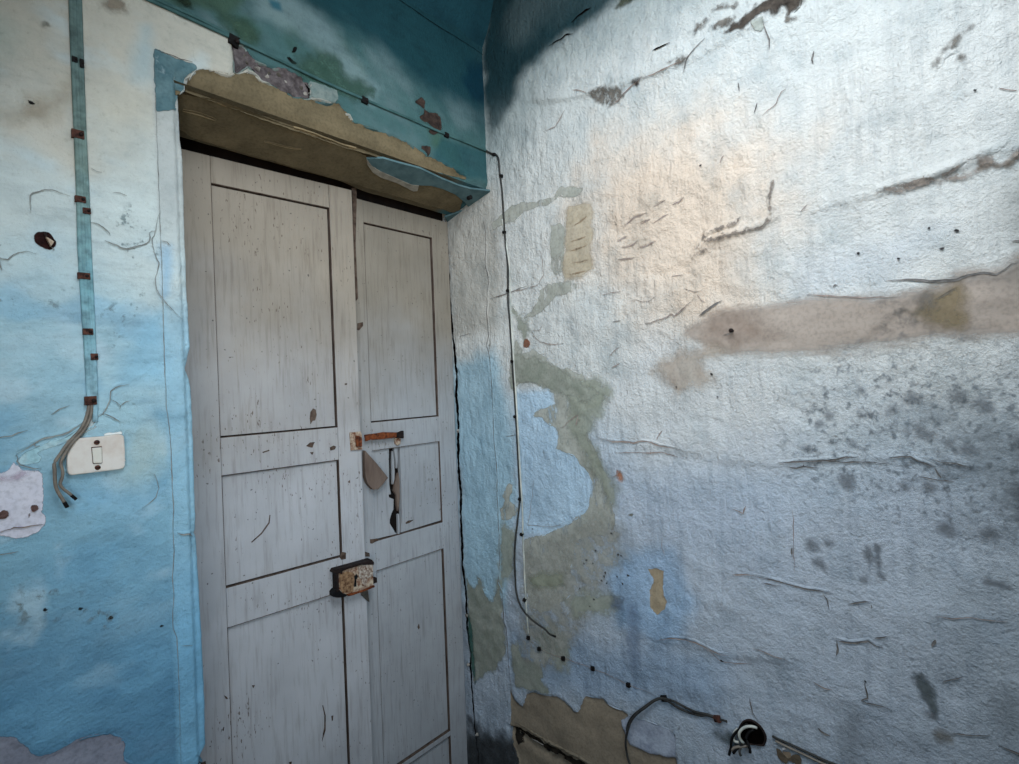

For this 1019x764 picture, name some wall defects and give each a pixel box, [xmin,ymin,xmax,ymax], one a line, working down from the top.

spalling [575,0,802,105]
spalling [153,44,490,222]
spalling [977,151,1019,170]
crack [27,187,70,212]
crack [0,249,37,270]
leakage [661,255,1019,390]
peeling [467,186,616,681]
crack [448,216,656,764]
spalling [648,568,667,615]
peeling [0,733,134,764]
spalling [510,690,677,764]